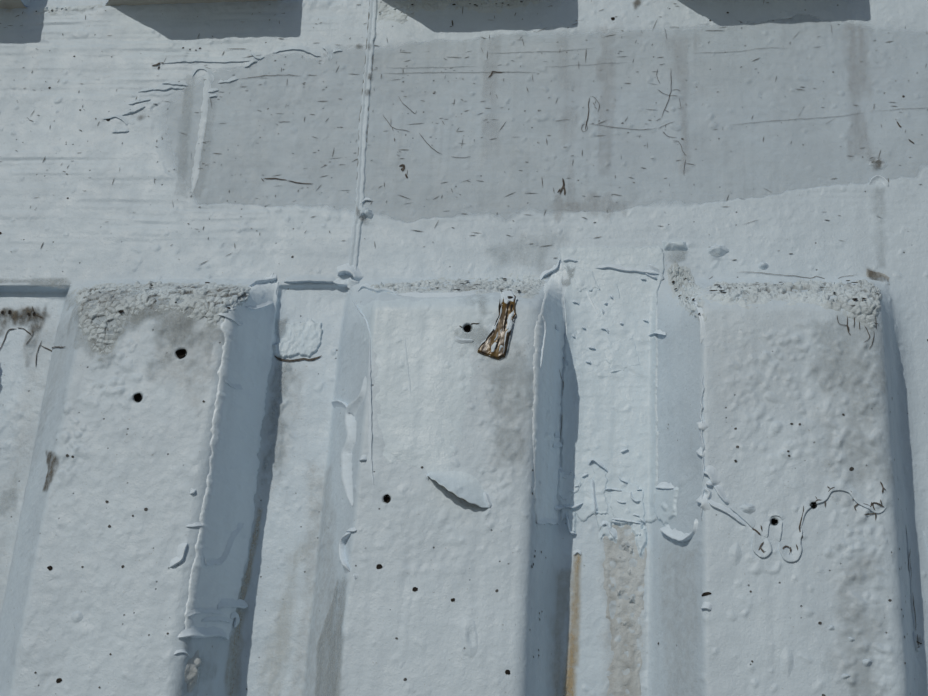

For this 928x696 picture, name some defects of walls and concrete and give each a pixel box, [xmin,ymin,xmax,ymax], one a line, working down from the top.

water stain [2,309,38,319]
peeling [72,273,323,640]
peeling [330,246,890,696]